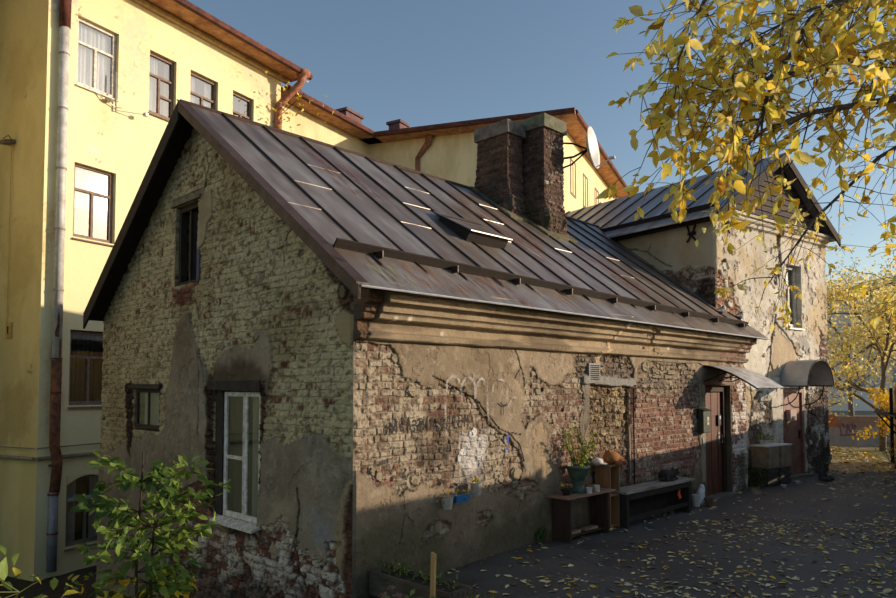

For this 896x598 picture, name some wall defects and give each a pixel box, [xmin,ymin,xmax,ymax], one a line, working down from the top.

spalling [323,263,354,315]
flaking render [662,258,741,315]
rust [38,313,70,444]
crack [431,374,525,462]
flaking render [628,348,701,485]
flaking render [719,339,774,492]
spalling [764,321,829,377]
spalling [804,387,830,449]
spalling [158,327,536,598]